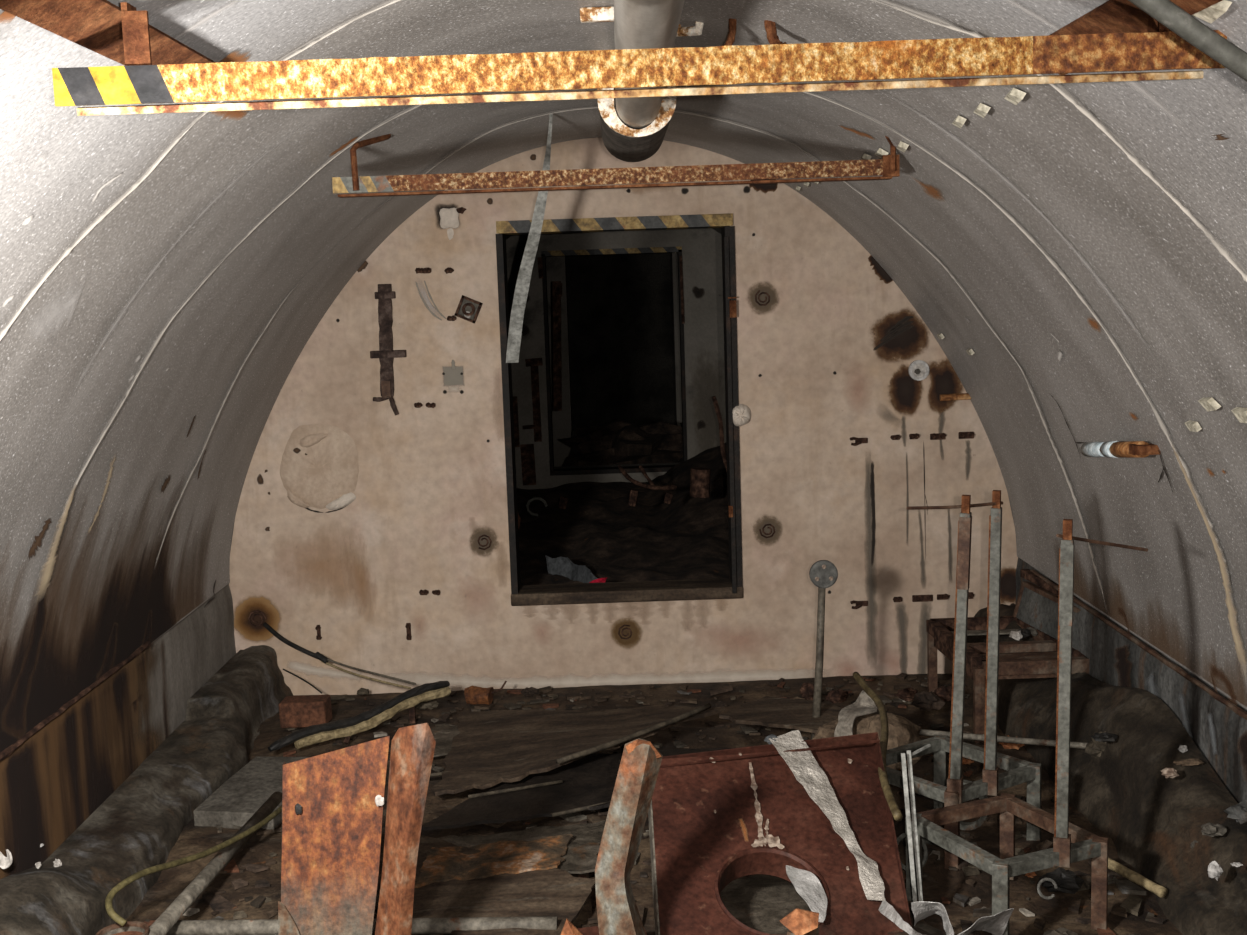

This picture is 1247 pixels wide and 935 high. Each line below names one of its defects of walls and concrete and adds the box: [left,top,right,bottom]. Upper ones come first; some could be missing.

corrosion [0,647,163,879]
leakage [0,488,204,738]
leakage [1074,451,1247,707]
leakage [1179,695,1192,738]